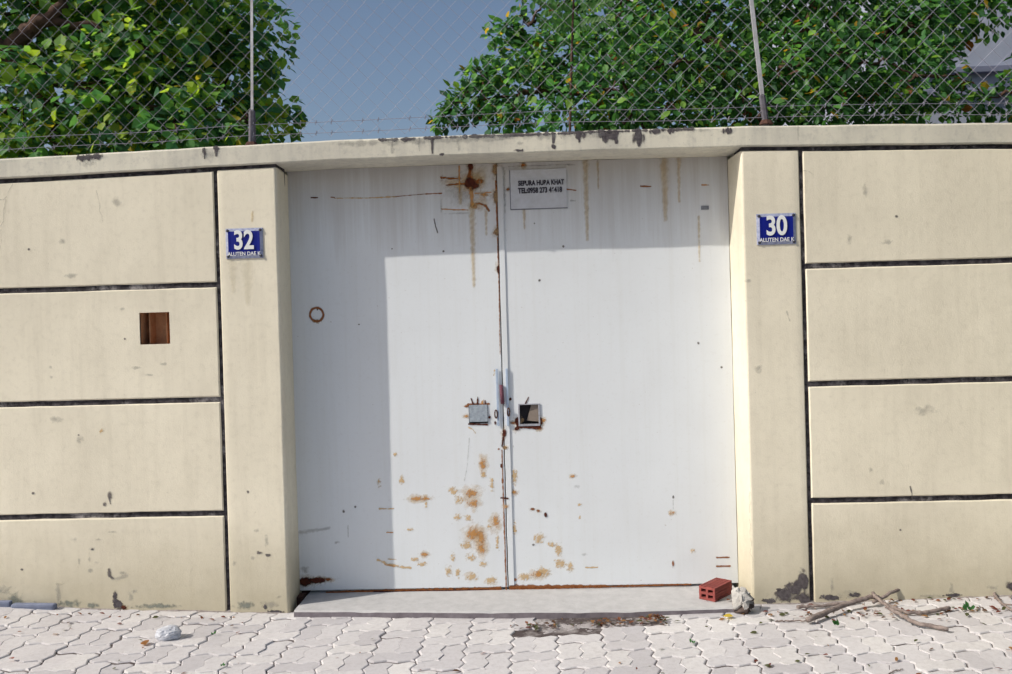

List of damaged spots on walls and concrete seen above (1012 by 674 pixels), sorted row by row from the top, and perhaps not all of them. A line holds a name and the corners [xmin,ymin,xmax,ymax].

rust [331,164,509,339]
rust [300,397,691,593]
spalling [762,574,810,603]